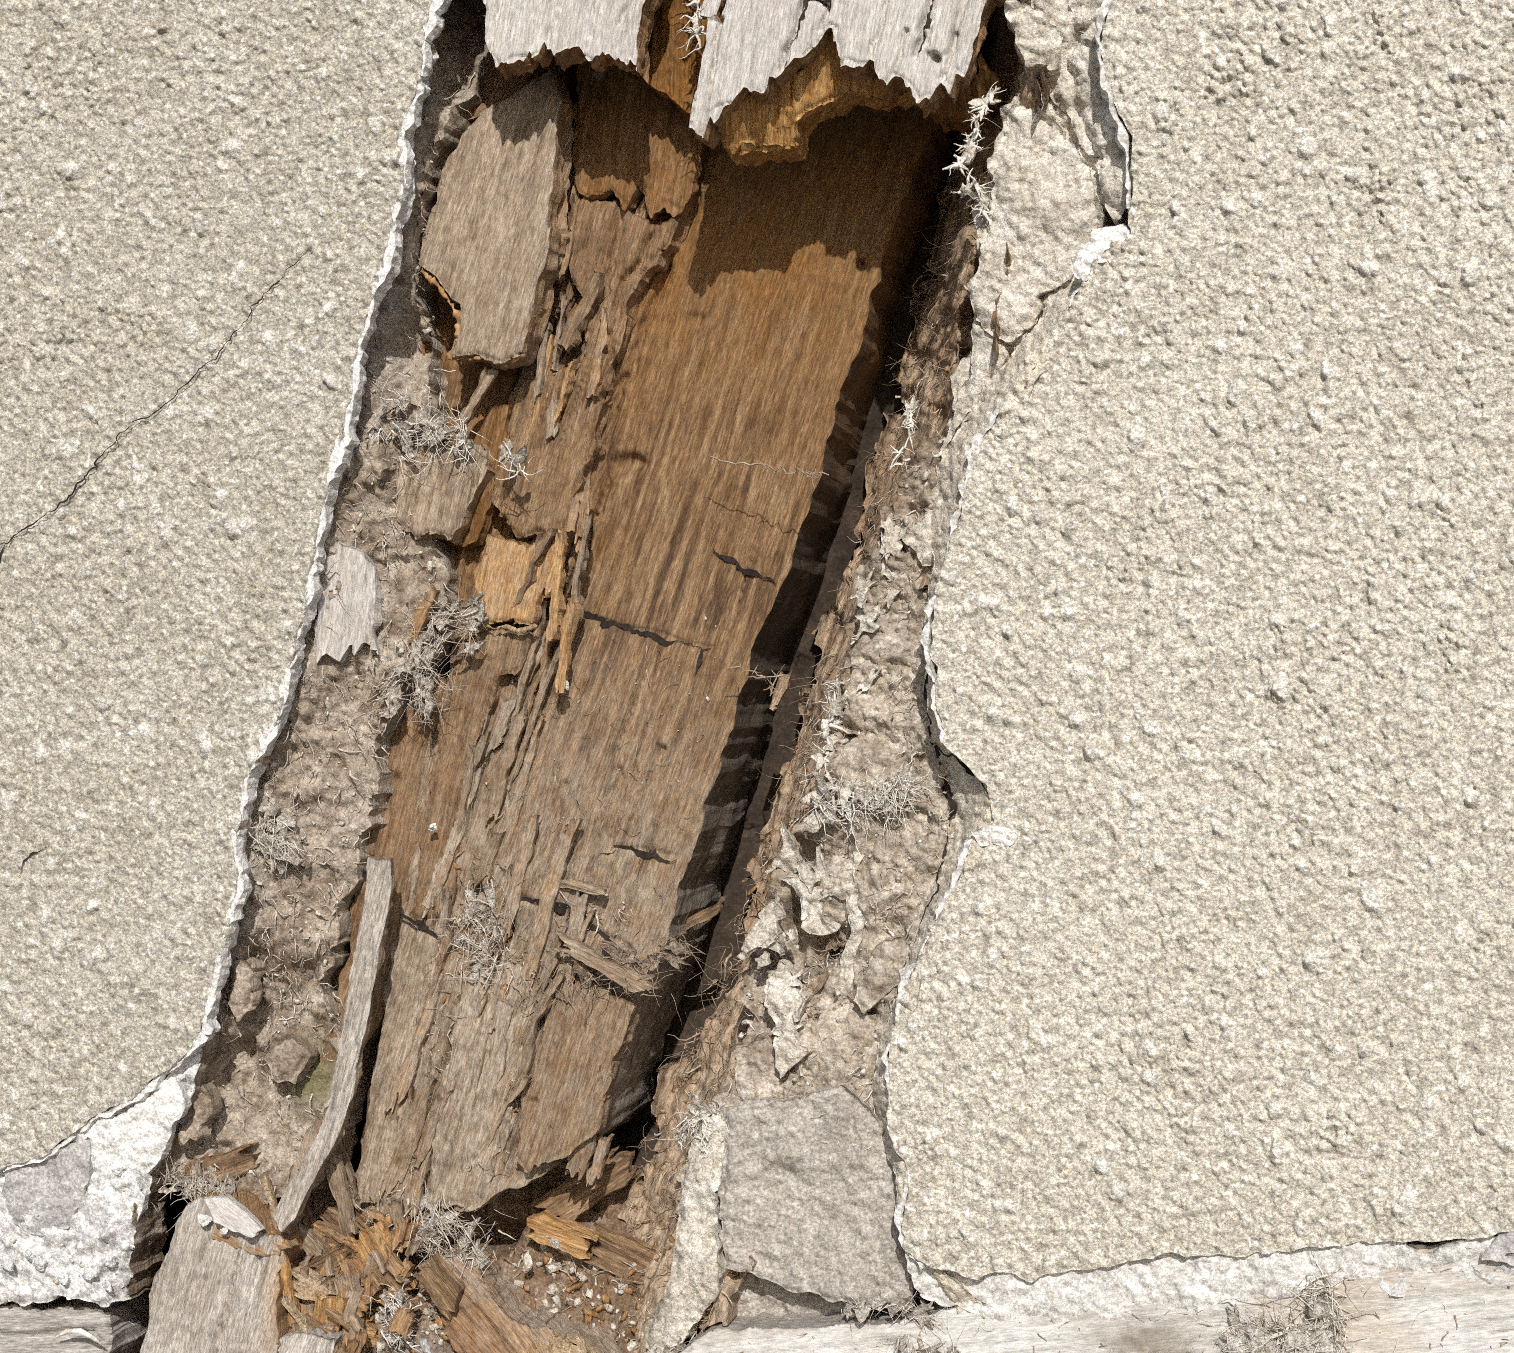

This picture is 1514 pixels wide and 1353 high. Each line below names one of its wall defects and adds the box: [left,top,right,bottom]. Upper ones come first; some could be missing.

crack [0,244,315,559]
spalling [0,0,452,1307]
spalling [618,0,1514,1353]
crack [19,847,46,876]
peeling [56,1328,105,1347]